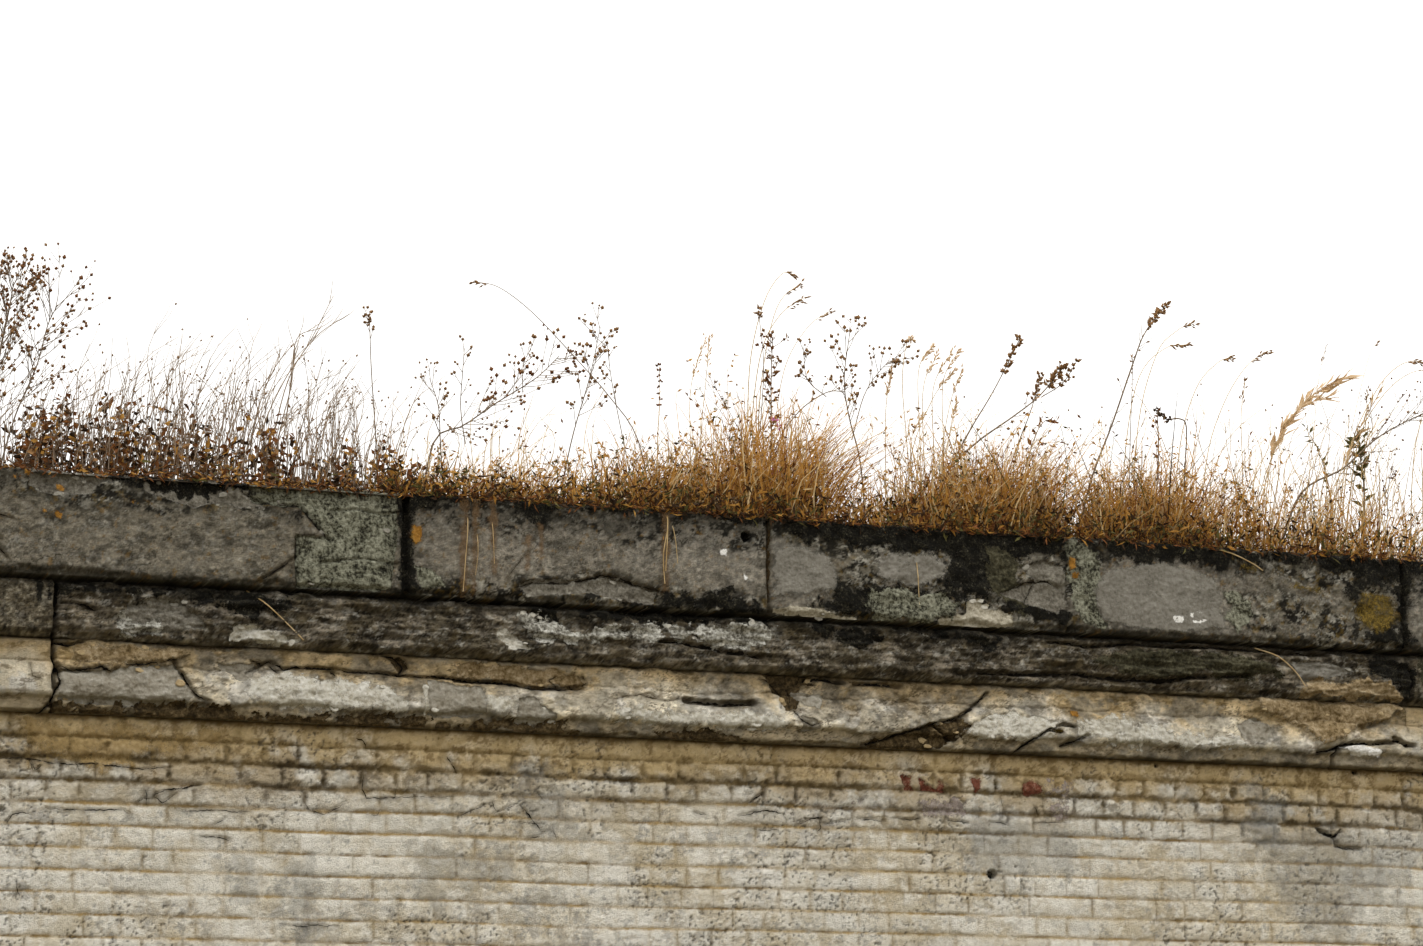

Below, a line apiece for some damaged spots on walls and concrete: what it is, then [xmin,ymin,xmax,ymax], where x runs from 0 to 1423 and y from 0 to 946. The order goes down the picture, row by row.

spalling [116,597,205,635]
crack [22,586,204,715]
crack [861,641,1307,745]
spalling [1291,660,1359,682]
crack [1012,725,1081,754]
crack [1316,708,1409,757]
crack [0,757,247,841]